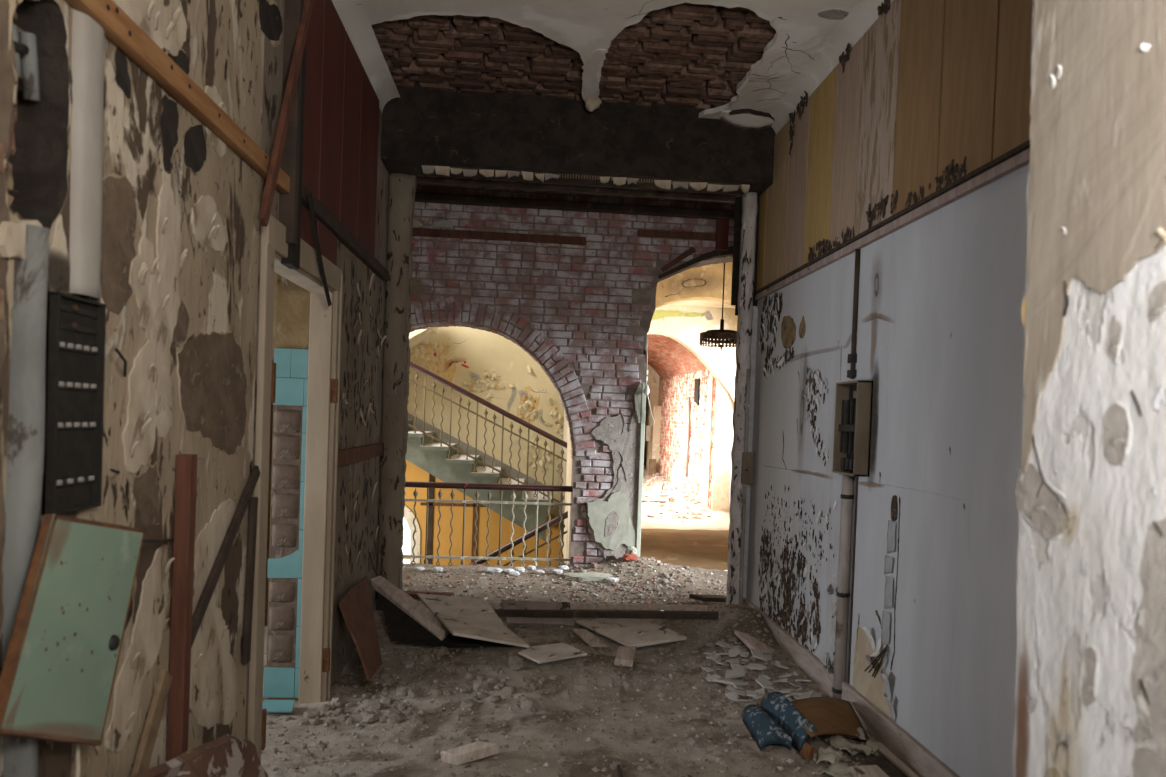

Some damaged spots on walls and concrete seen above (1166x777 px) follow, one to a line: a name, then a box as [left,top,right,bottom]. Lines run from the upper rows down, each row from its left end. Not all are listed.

peeling [113,46,131,99]
peeling [113,0,190,75]
peeling [256,0,283,47]
flaking render [371,2,777,116]
flaking render [0,0,18,224]
peeling [866,156,967,229]
peeling [100,92,247,527]
spalling [1106,315,1123,365]
spalling [1148,281,1166,324]
spalling [1102,390,1142,466]
damp [758,484,837,652]
spalling [1130,518,1166,777]